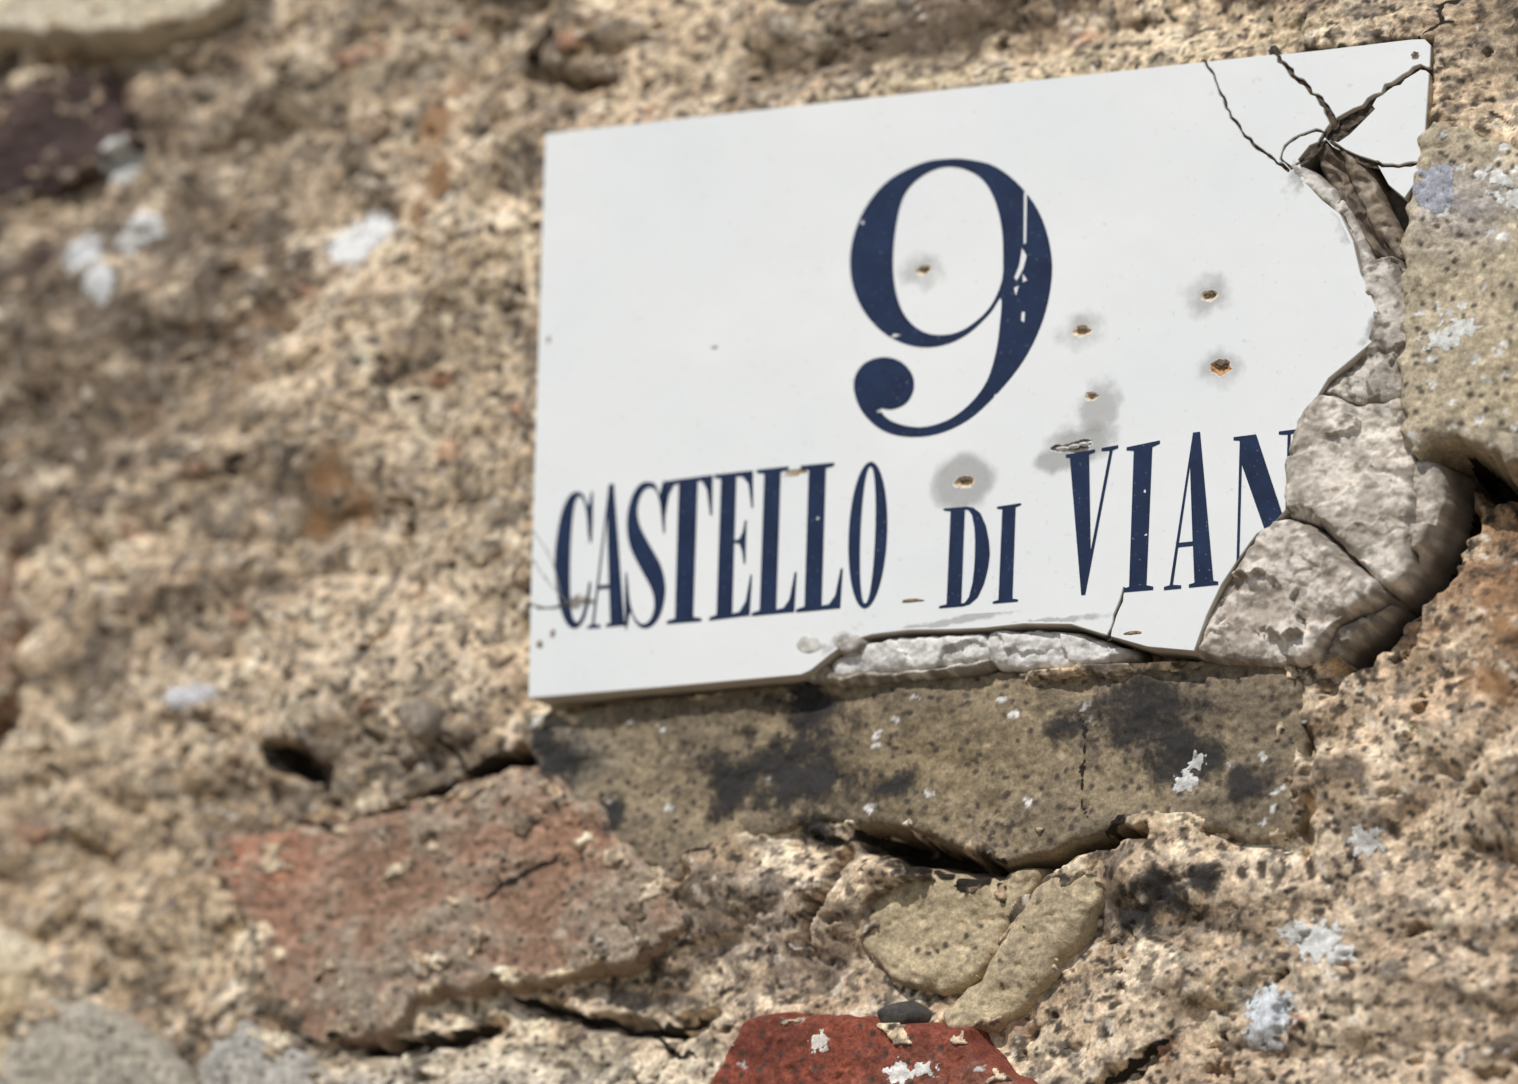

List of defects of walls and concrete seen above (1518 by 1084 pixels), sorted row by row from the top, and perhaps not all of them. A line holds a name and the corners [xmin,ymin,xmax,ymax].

crack [1201,0,1460,172]
damp [532,726,592,789]
damp [595,795,625,833]
damp [697,681,917,850]